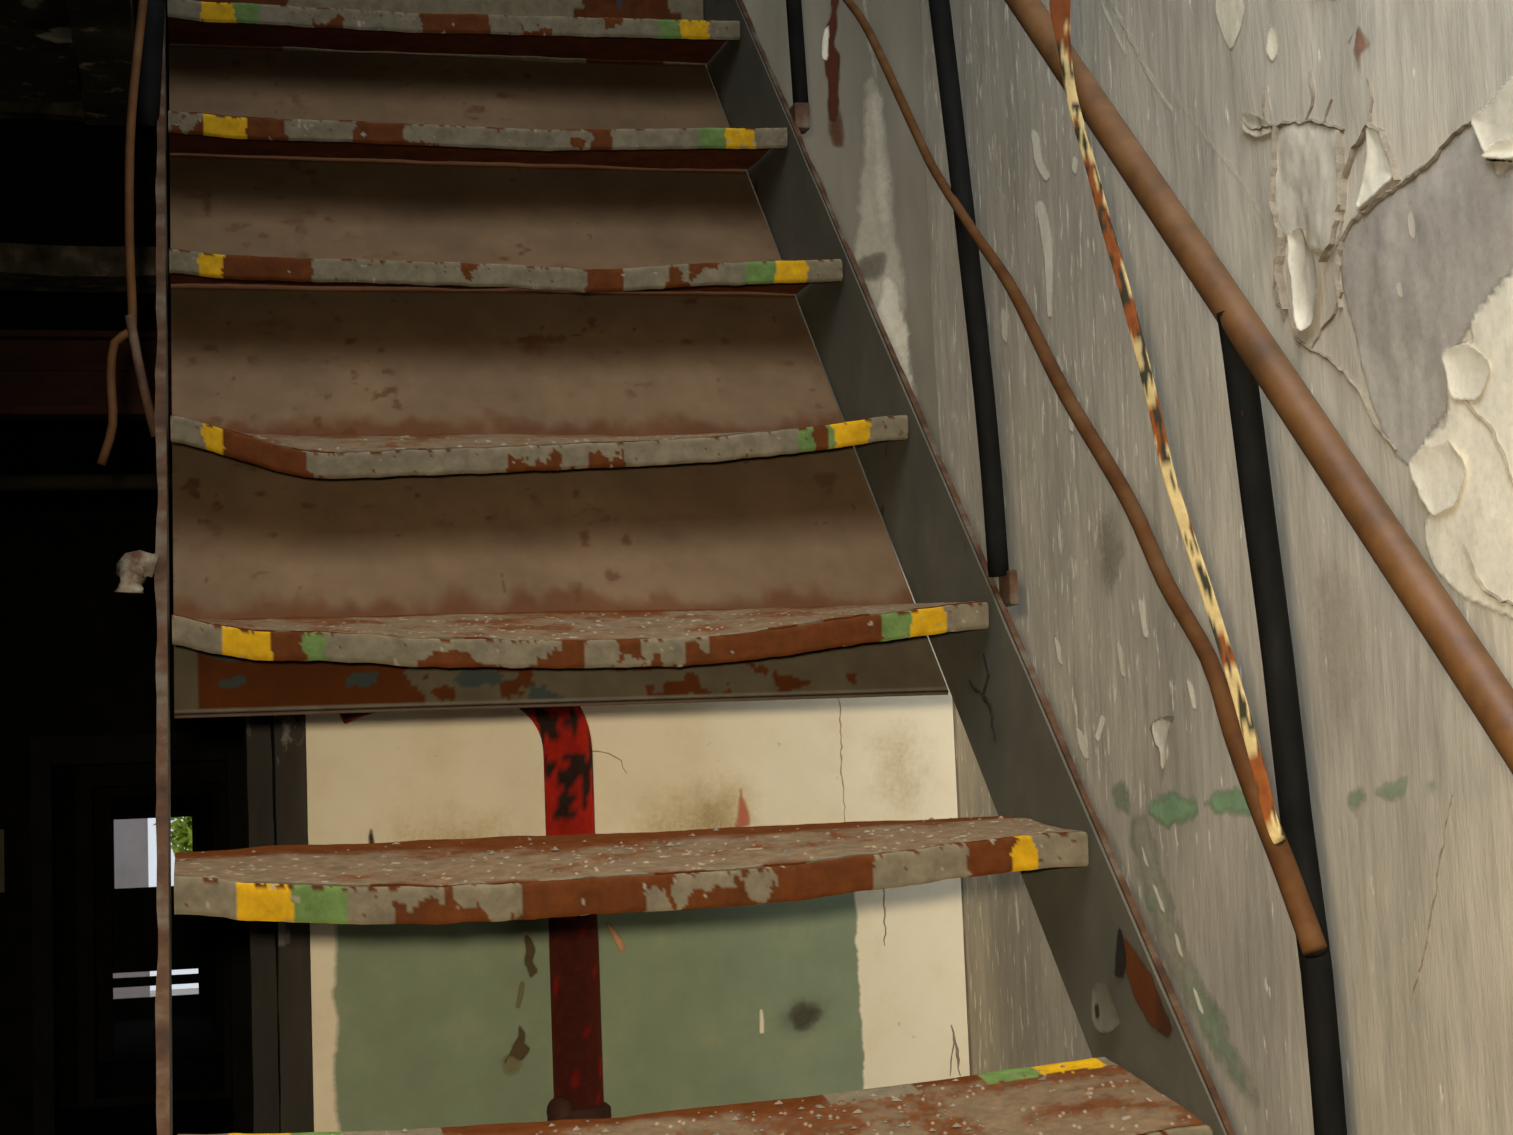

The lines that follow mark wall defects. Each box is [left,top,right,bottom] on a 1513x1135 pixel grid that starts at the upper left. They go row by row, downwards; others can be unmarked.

crack [1241,71,1401,210]
crack [1272,258,1397,451]
peeling [1335,76,1513,619]